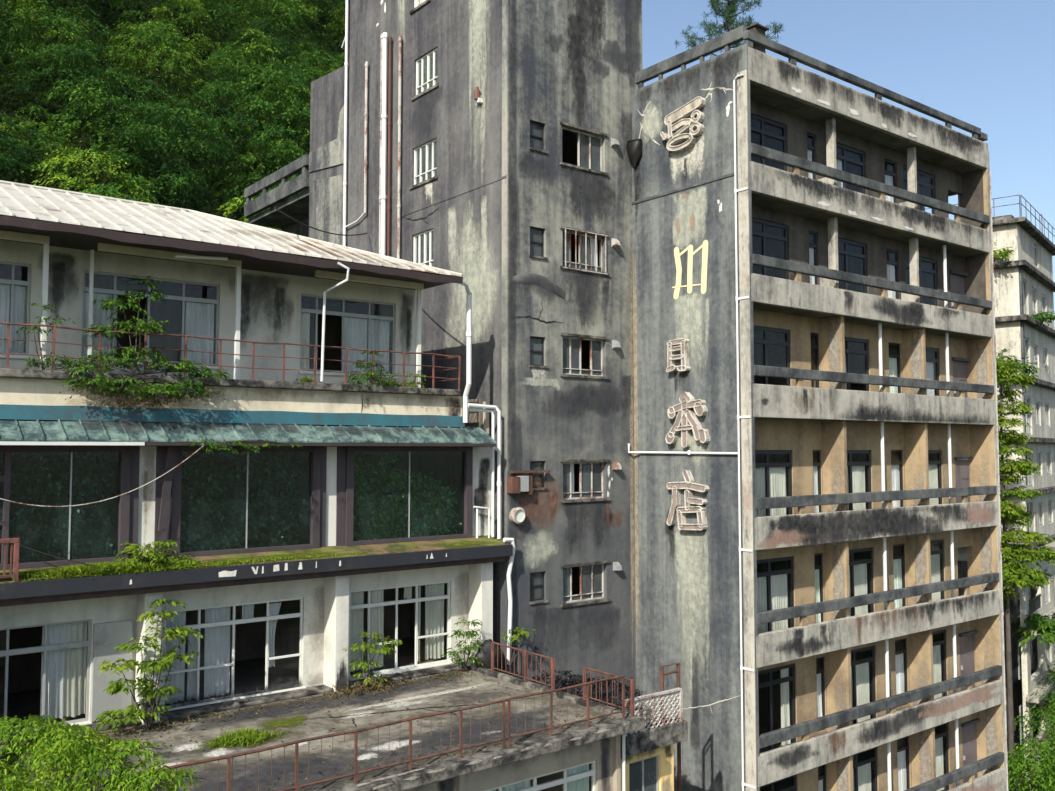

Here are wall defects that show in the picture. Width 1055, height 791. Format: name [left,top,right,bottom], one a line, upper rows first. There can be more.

water stain [567,0,604,131]
water stain [791,175,833,199]
water stain [902,208,945,231]
water stain [49,254,75,313]
water stain [240,275,291,334]
crack [512,302,564,324]
water stain [779,515,825,534]
water stain [863,512,917,535]
water stain [931,505,967,523]
water stain [795,629,804,653]
water stain [770,745,818,767]